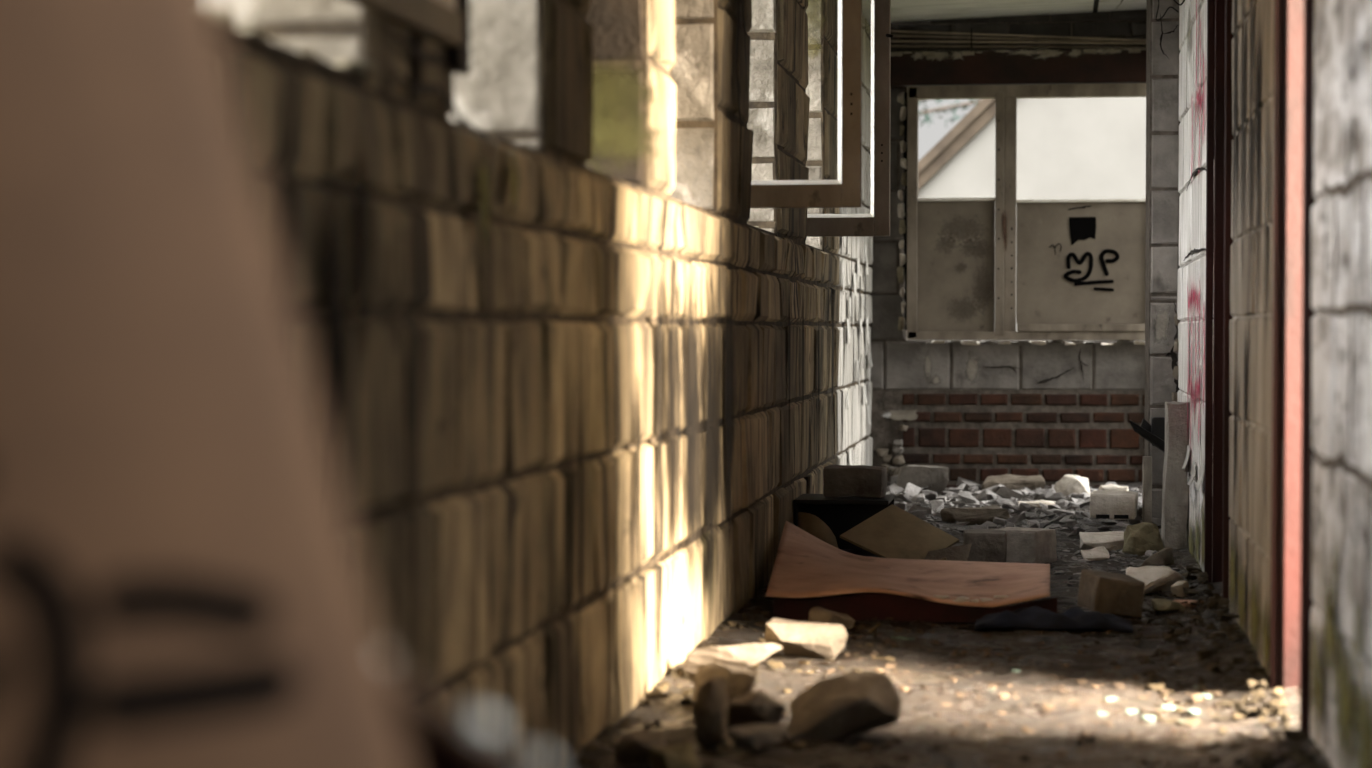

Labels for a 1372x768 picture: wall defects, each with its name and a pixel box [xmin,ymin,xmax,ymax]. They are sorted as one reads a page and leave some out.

water stain [636,270,735,607]
crack [1310,132,1372,628]